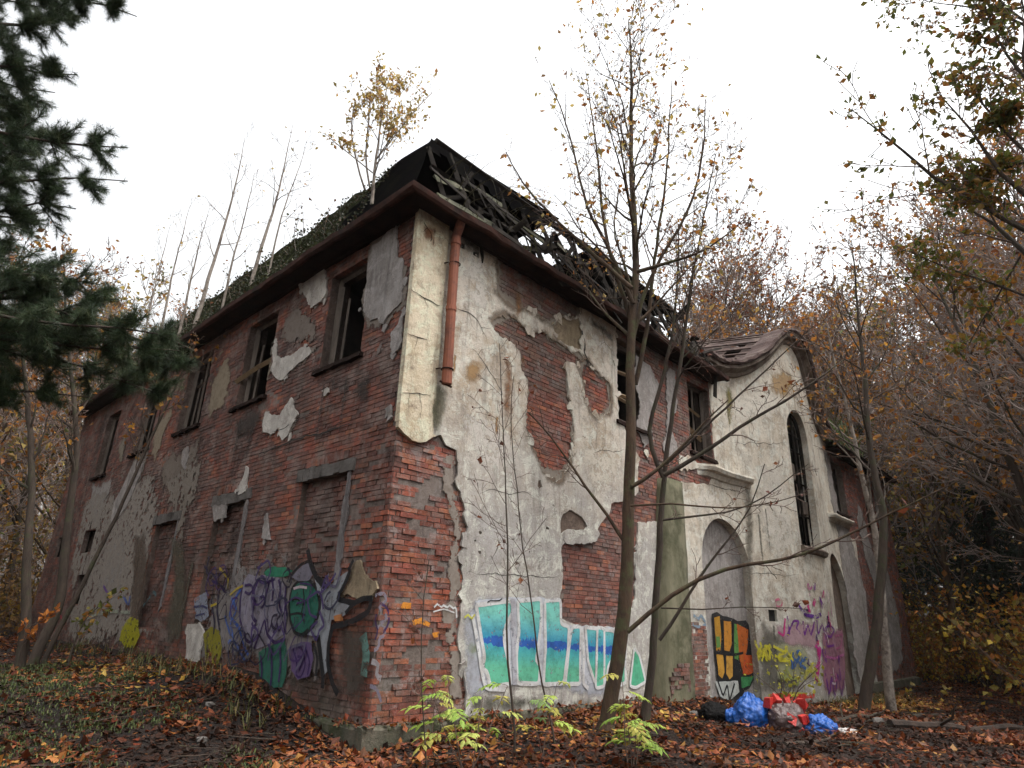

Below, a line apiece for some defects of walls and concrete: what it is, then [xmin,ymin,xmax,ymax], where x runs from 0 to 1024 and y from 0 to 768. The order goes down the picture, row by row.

peeling [266,269,329,388]
peeling [261,397,299,441]
spalling [332,225,783,726]
peeling [184,513,330,684]